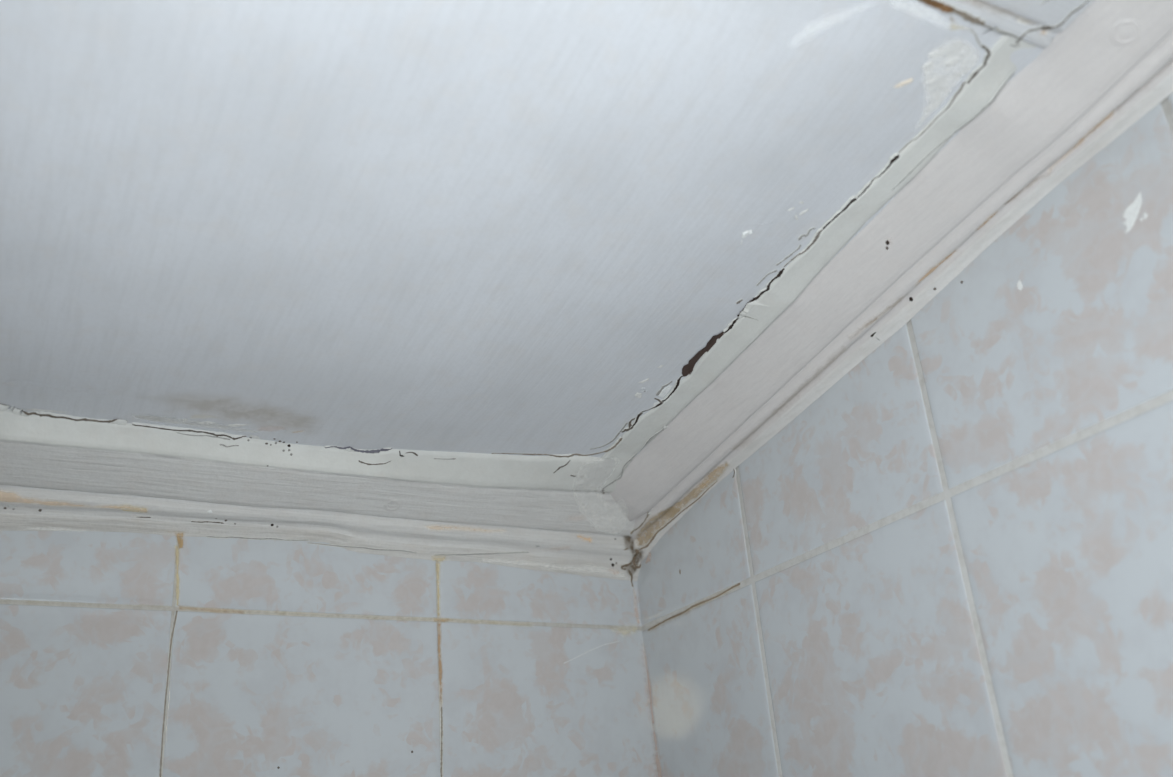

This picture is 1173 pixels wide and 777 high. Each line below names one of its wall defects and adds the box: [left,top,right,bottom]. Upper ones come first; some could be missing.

crack [491,0,1089,493]
crack [0,403,246,448]
crack [325,446,456,466]